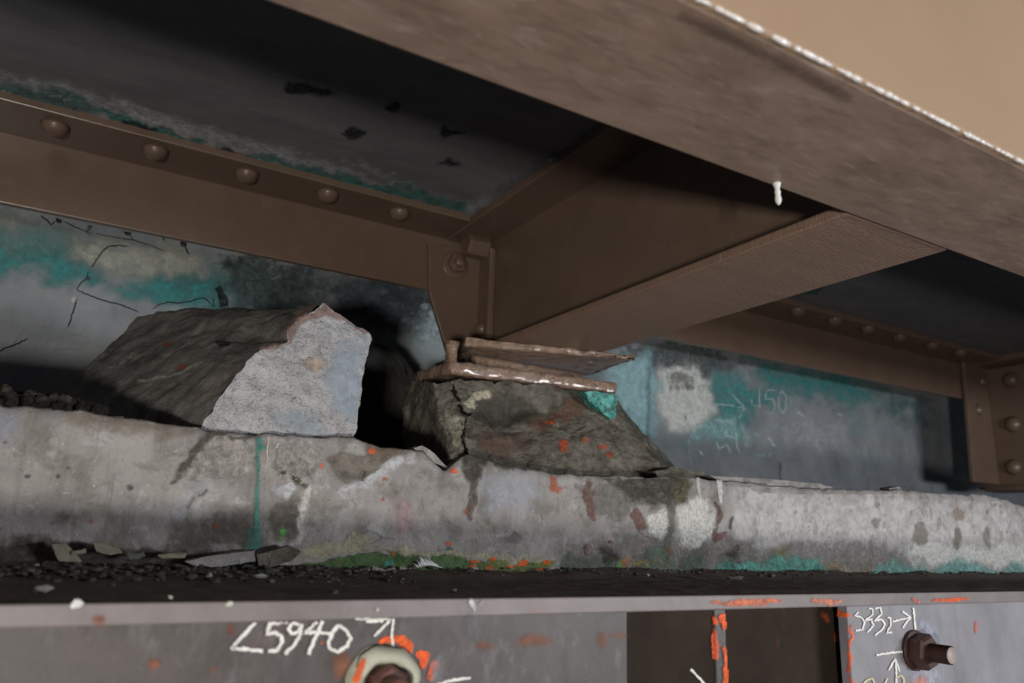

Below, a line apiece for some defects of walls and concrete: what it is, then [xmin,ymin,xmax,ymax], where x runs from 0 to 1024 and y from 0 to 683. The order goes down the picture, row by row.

crack [41,215,214,326]
crack [450,384,472,455]
leakage [608,350,663,437]
leakage [688,362,870,466]
peeling [52,542,145,571]